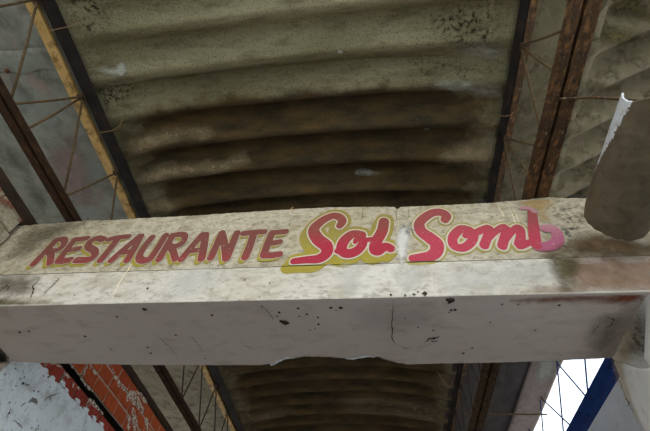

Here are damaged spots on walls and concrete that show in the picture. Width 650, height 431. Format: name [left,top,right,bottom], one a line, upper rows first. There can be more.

damp [137,132,179,152]
damp [445,145,492,167]
damp [146,167,197,182]
flaking render [42,363,104,428]